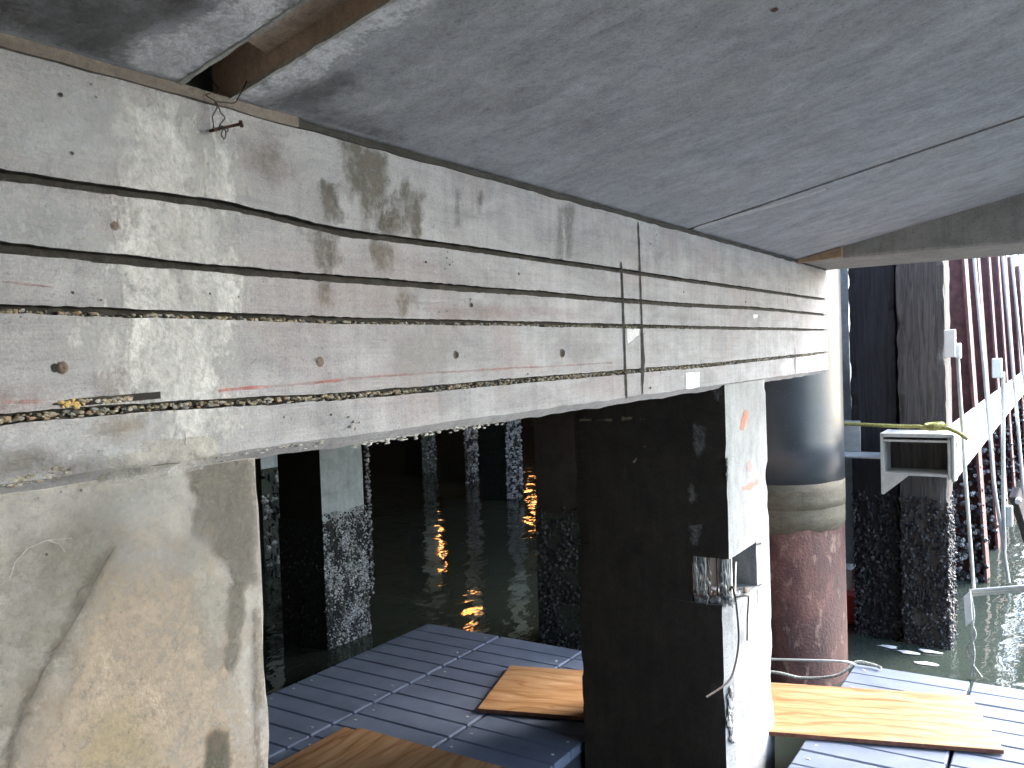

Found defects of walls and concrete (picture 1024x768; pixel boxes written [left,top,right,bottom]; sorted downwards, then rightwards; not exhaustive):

water stain [324,187,338,218]
water stain [342,141,422,238]
spalling [0,299,697,329]
spalling [0,352,823,424]
spalling [693,556,748,608]